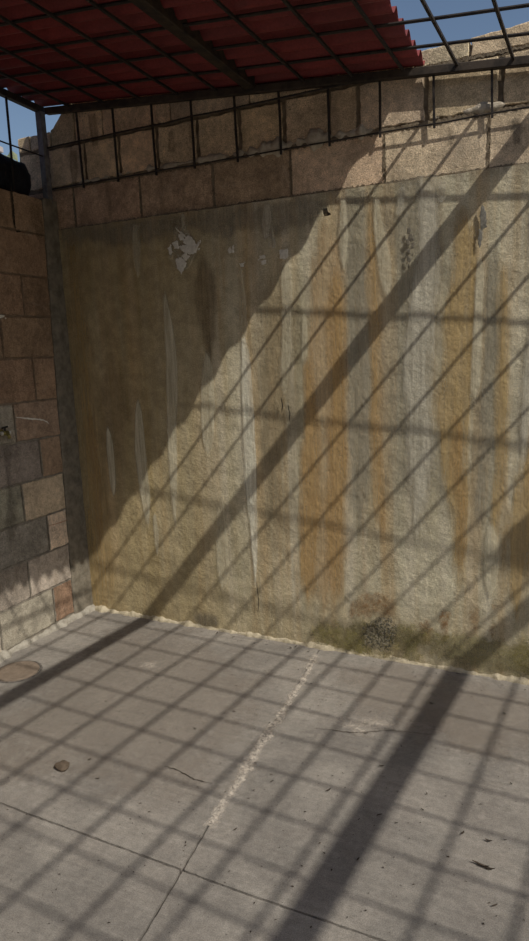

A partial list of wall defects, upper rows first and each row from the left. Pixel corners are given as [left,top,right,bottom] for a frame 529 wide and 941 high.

peeling [168,229,201,274]
water stain [106,428,116,494]
water stain [135,401,159,545]
water stain [164,295,177,519]
water stain [241,336,257,578]
rust [438,218,478,562]